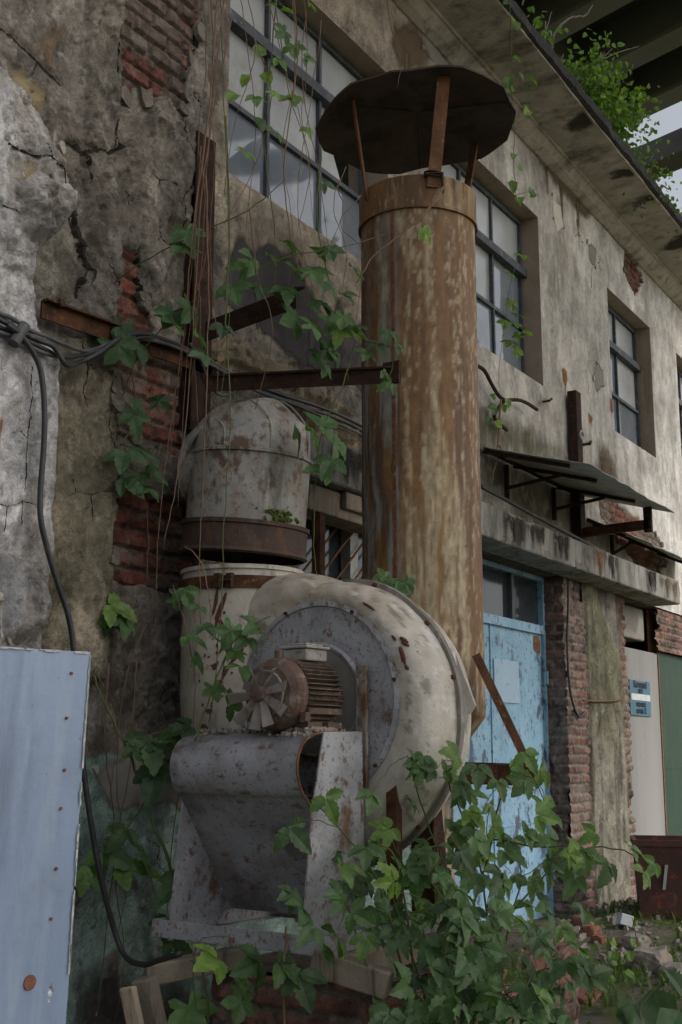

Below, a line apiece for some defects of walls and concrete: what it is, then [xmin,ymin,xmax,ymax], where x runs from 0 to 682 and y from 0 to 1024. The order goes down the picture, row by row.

spalling [120,0,209,117]
water stain [567,113,594,132]
water stain [539,159,590,236]
water stain [610,169,634,180]
crack [68,174,194,319]
spalling [623,252,644,296]
water stain [664,235,682,250]
spalling [109,350,188,457]
spalling [109,477,199,596]
water stain [504,512,569,560]
spalling [599,500,667,575]
water stain [646,570,677,598]